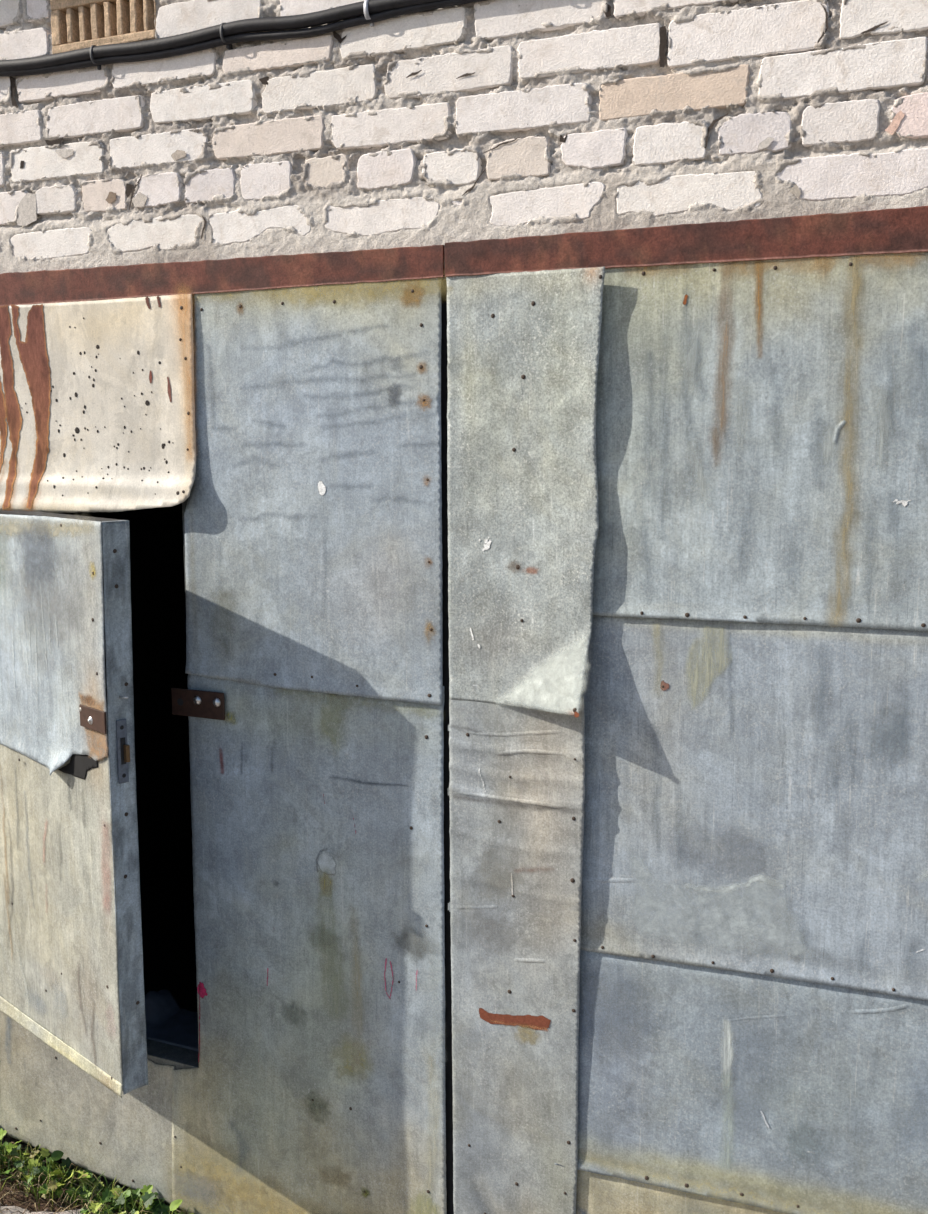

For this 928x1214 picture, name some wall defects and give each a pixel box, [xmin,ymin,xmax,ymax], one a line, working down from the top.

rust [257,271,445,304]
rust [725,260,761,328]
rust [0,304,51,511]
rust [714,323,729,449]
rust [479,1008,551,1031]
leakage [724,1021,732,1083]